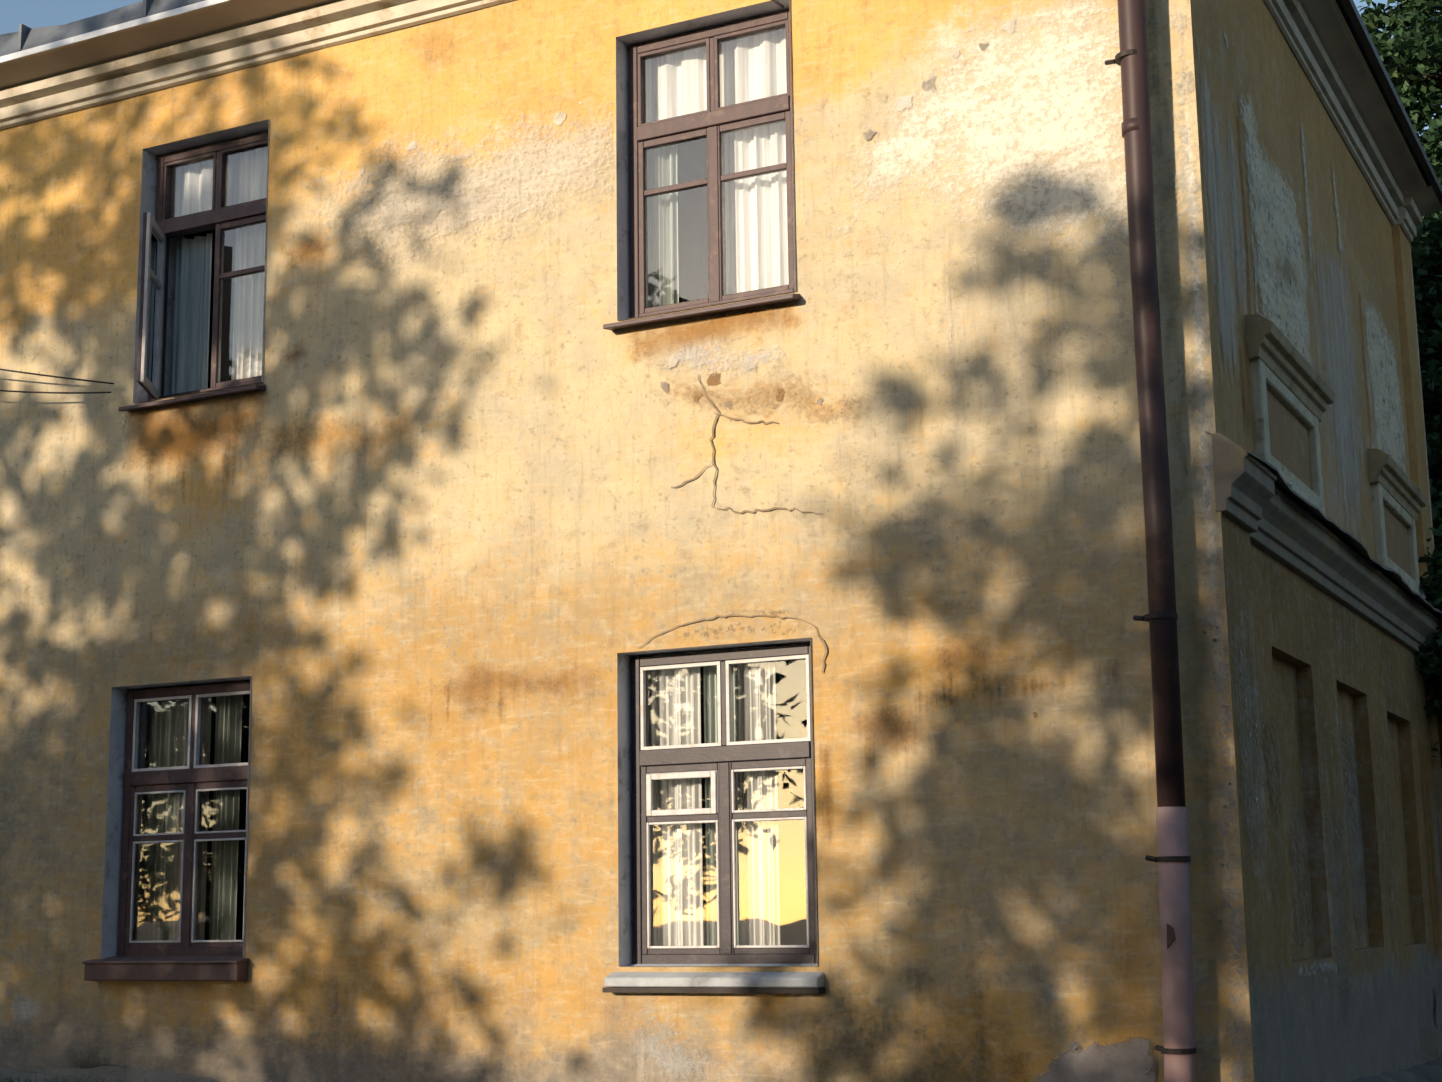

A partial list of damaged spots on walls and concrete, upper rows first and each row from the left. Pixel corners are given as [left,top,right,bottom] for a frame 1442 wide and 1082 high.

peeling [838,0,1129,259]
peeling [1202,79,1309,378]
crack [671,375,822,514]
peeling [1365,302,1406,472]